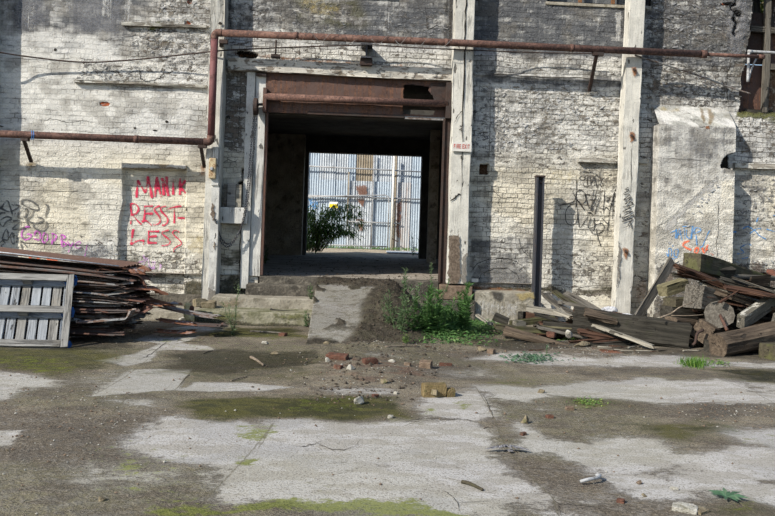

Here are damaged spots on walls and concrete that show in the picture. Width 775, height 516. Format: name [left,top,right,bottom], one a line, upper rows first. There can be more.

damp [17,0,44,27]
damp [73,0,130,31]
corrosion [739,0,775,112]